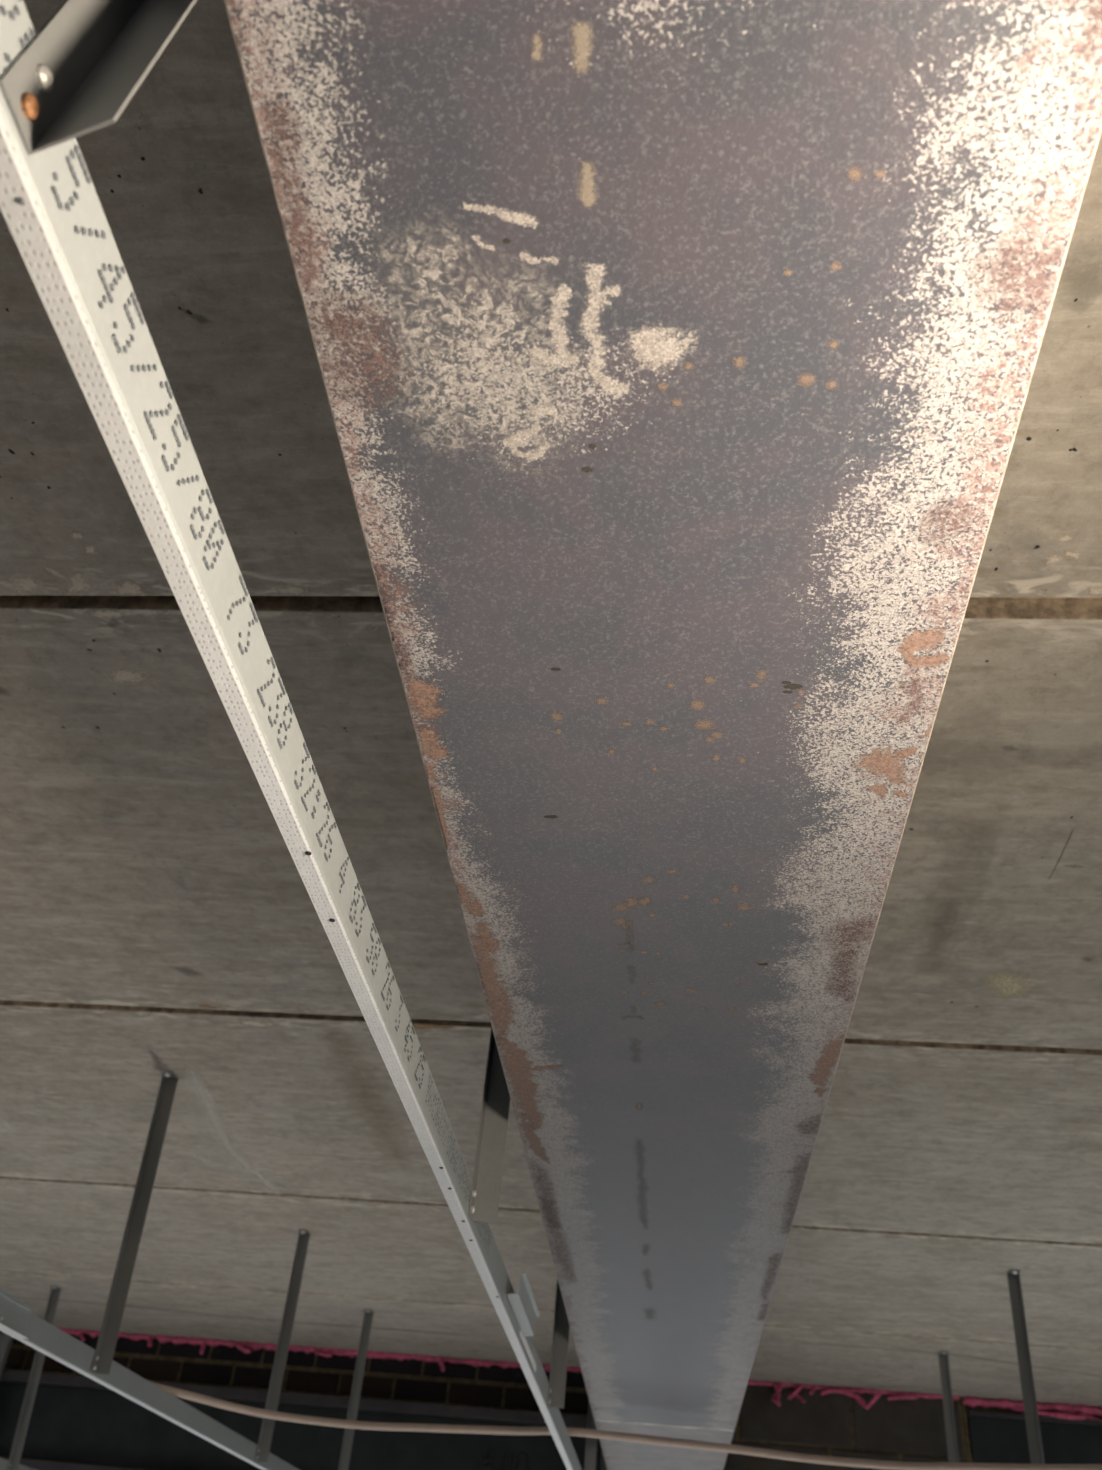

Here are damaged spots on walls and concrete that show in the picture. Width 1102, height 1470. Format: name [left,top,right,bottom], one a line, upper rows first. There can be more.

corrosion [1065,0,1102,58]
corrosion [978,241,1057,320]
corrosion [897,628,949,723]
corrosion [854,729,930,798]
corrosion [828,919,873,1001]
corrosion [456,883,574,1282]
corrosion [810,1035,844,1097]